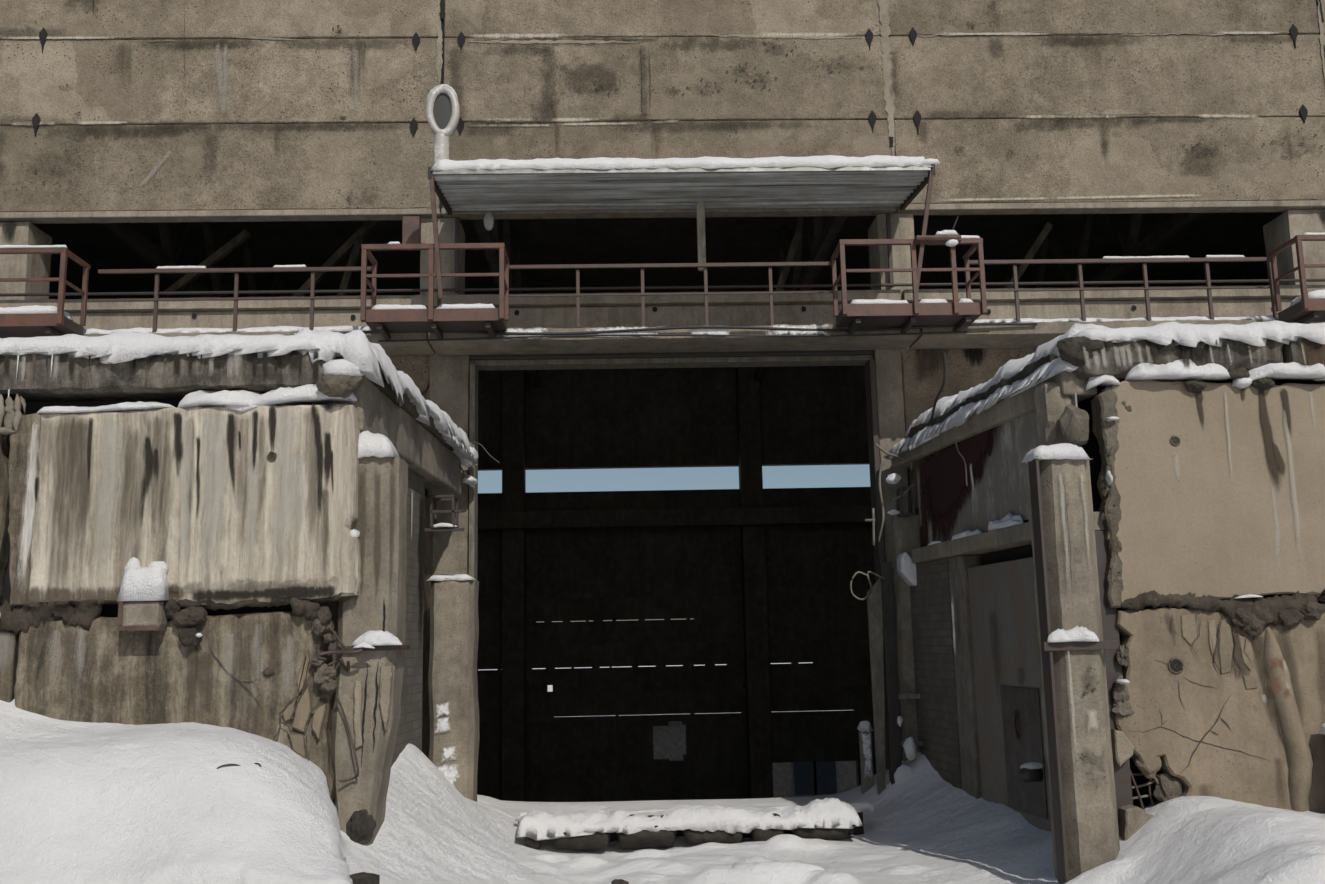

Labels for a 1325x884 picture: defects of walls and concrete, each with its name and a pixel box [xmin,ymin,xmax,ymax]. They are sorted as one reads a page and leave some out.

damp [141,437,159,516]
damp [174,413,200,512]
damp [227,406,276,487]
corrosion [916,427,996,563]
spalling [1093,386,1132,608]
damp [1193,391,1204,425]
damp [1242,388,1291,483]
spalling [1082,645,1135,717]
crack [1139,613,1270,776]
spalling [1130,768,1164,811]